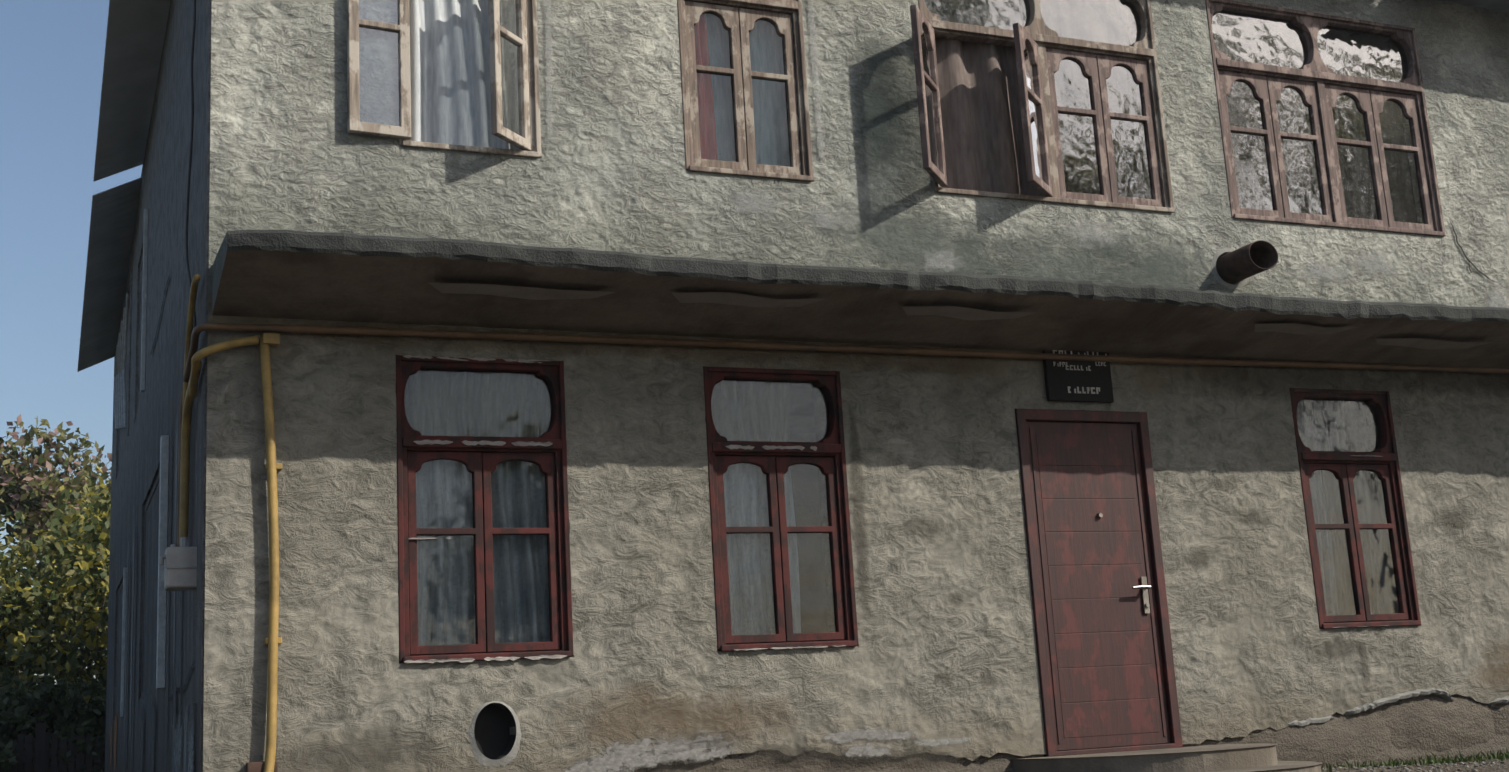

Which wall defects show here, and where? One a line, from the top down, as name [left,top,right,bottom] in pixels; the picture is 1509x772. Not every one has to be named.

peeling [564,731,736,772]
flaking render [1249,688,1509,766]